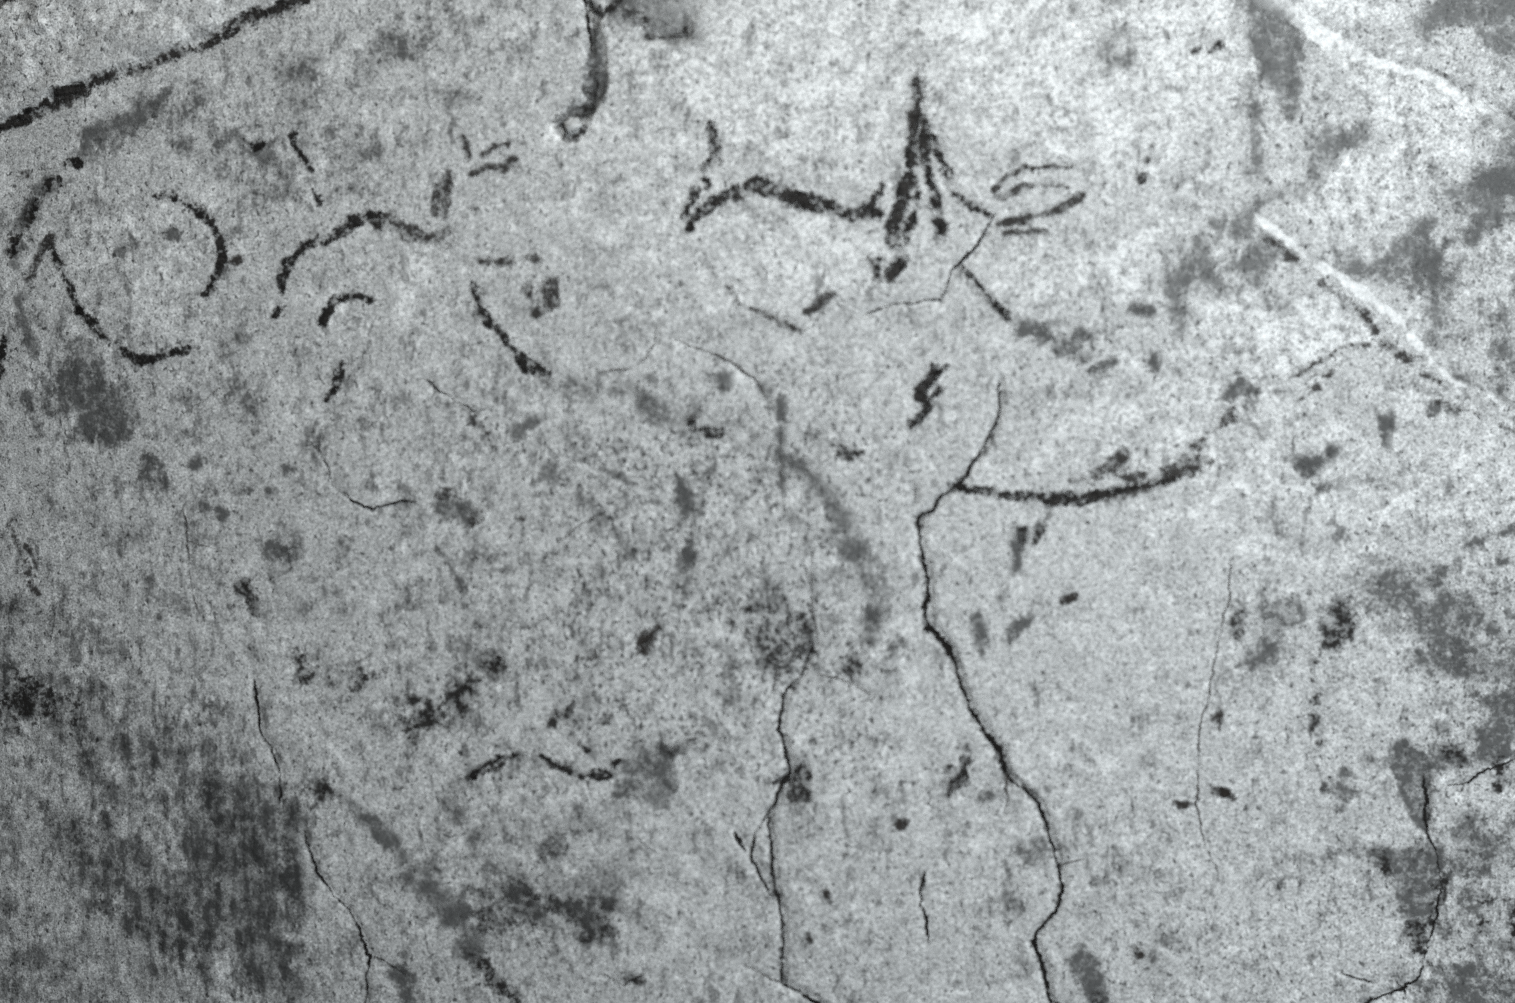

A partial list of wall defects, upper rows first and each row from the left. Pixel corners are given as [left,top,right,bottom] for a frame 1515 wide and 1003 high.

crack [734,437,876,1003]
crack [914,381,1085,1003]